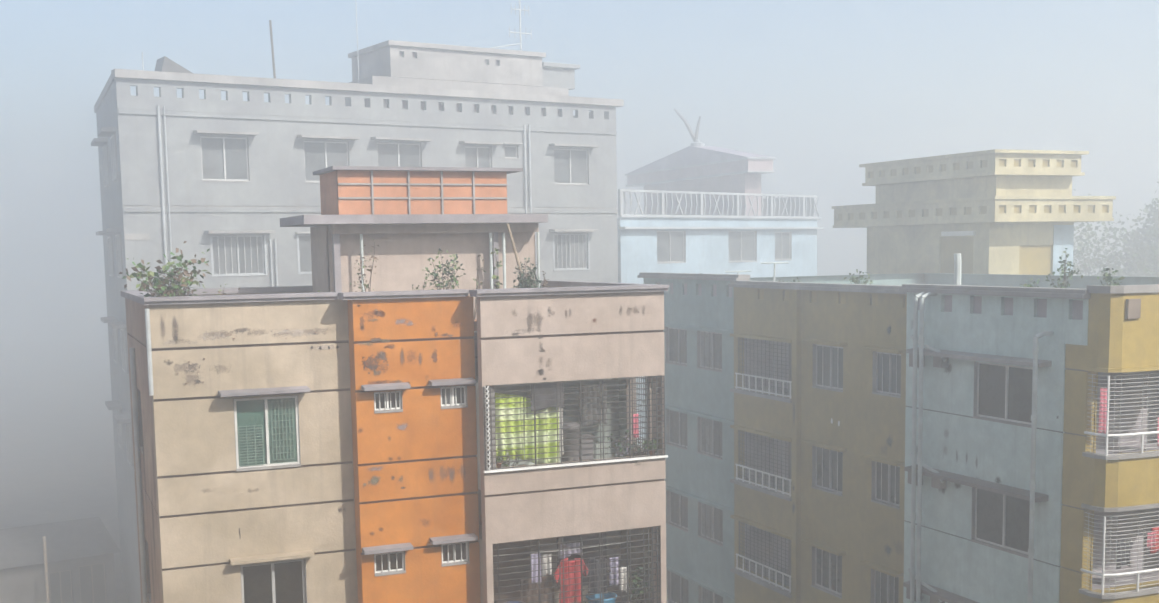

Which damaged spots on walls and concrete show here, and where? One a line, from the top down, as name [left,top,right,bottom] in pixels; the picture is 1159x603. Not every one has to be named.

peeling [362,351,410,384]